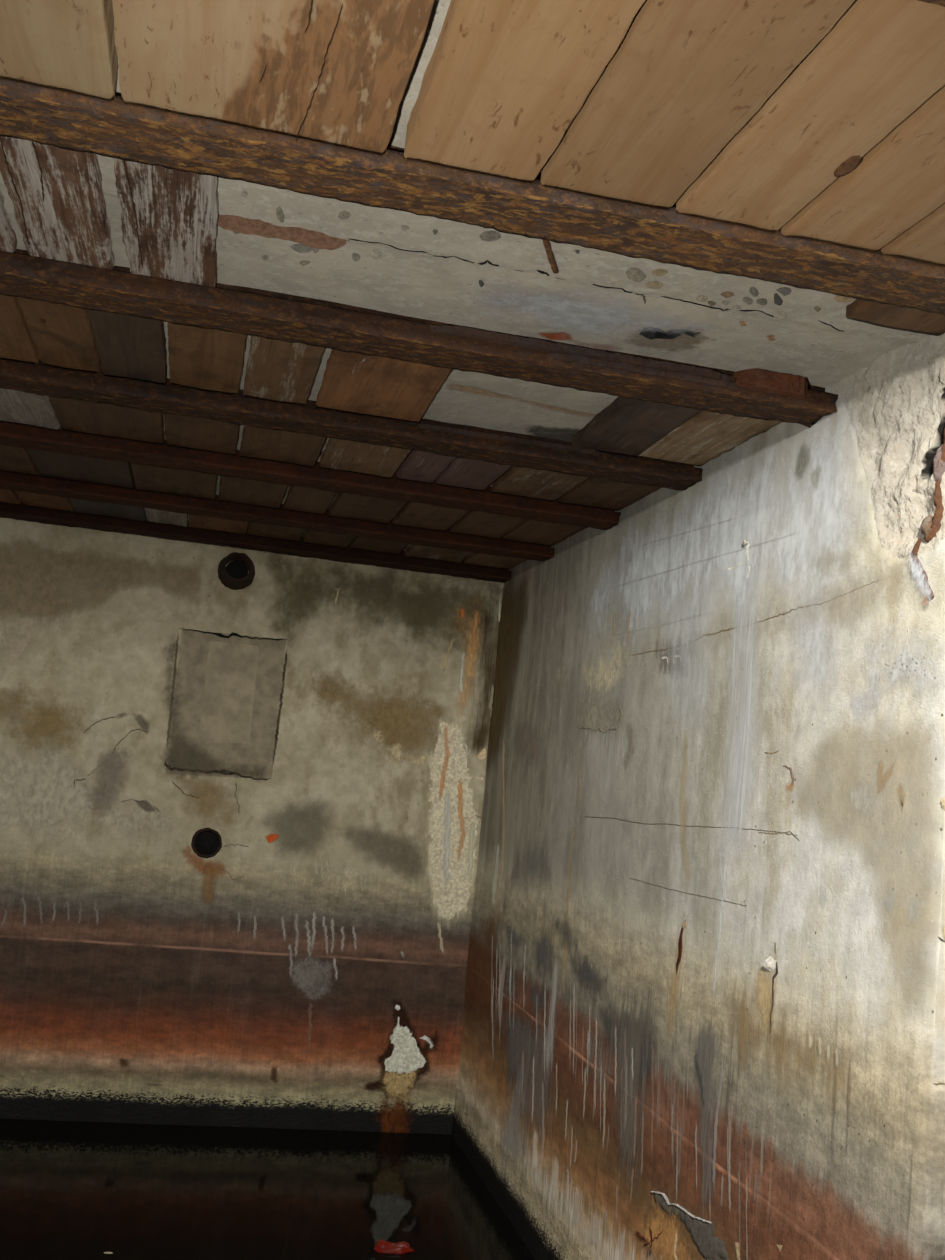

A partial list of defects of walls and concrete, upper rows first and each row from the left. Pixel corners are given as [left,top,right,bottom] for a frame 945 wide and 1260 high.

crack [349,238,774,317]
spalling [629,327,708,351]
spalling [829,332,945,559]
corrosion [913,427,945,600]
damp [0,545,199,615]
damp [275,561,524,952]
damp [282,912,357,999]
damp [465,922,499,1007]
corrosion [670,920,686,1011]
corrosion [636,1227,662,1255]
peeling [645,1191,740,1260]